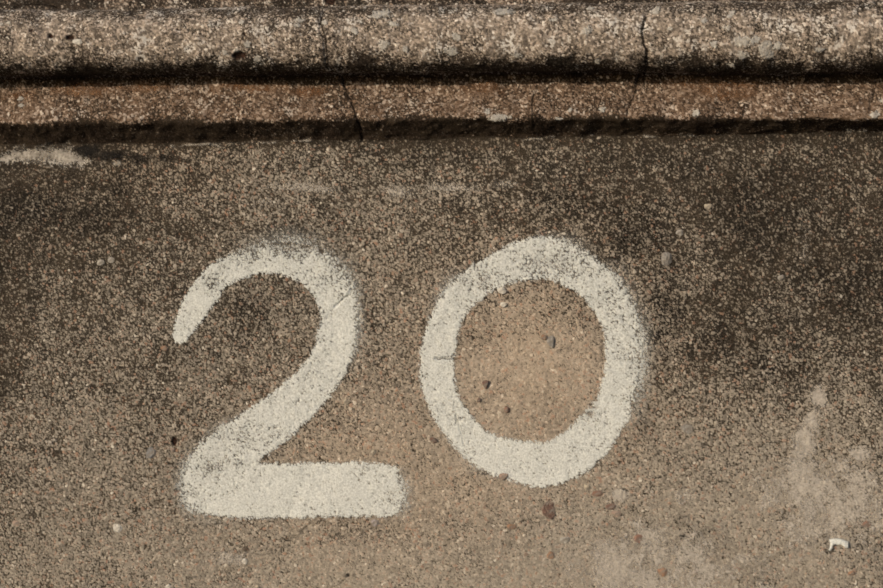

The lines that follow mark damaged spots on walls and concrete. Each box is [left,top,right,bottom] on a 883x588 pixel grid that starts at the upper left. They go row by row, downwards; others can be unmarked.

crack [319,14,363,140]
crack [626,17,648,119]